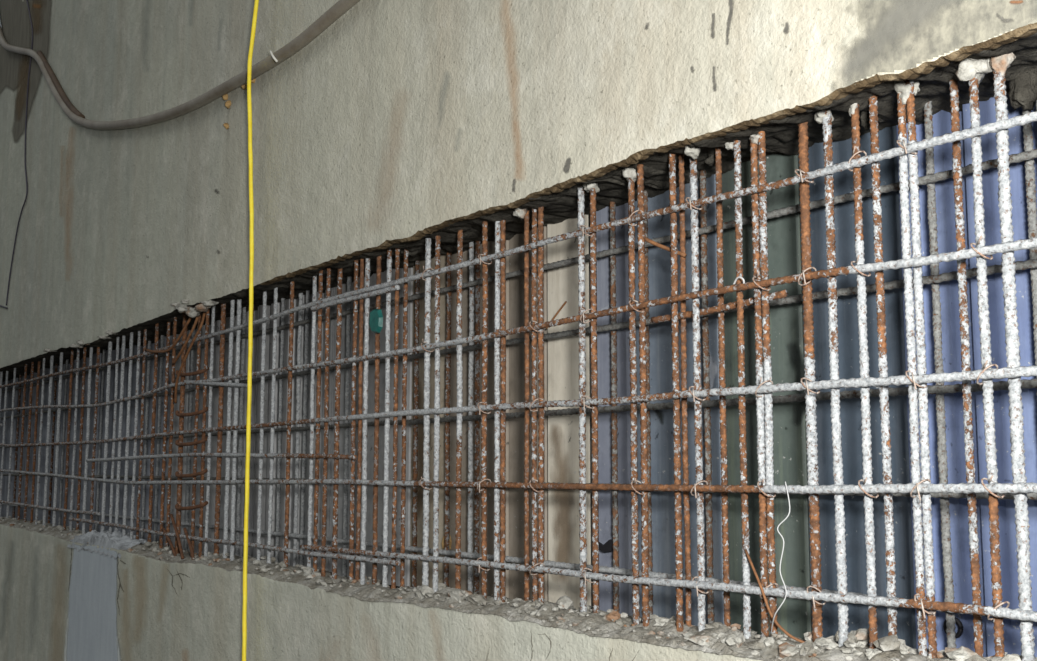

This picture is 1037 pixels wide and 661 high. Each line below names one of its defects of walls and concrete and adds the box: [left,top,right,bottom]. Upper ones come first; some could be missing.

leakage [0,0,51,142]
leakage [845,0,1037,85]
spalling [0,299,248,561]